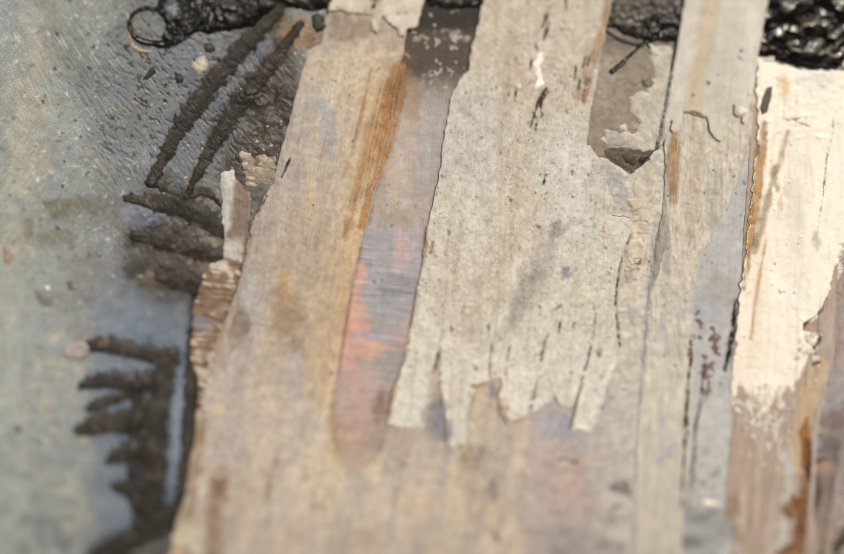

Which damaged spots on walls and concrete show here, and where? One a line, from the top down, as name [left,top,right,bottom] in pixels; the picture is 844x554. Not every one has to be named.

spalling [532,52,544,88]
peeling [601,44,675,173]
rust [743,121,777,290]
crack [614,237,630,348]
rust [776,418,827,554]